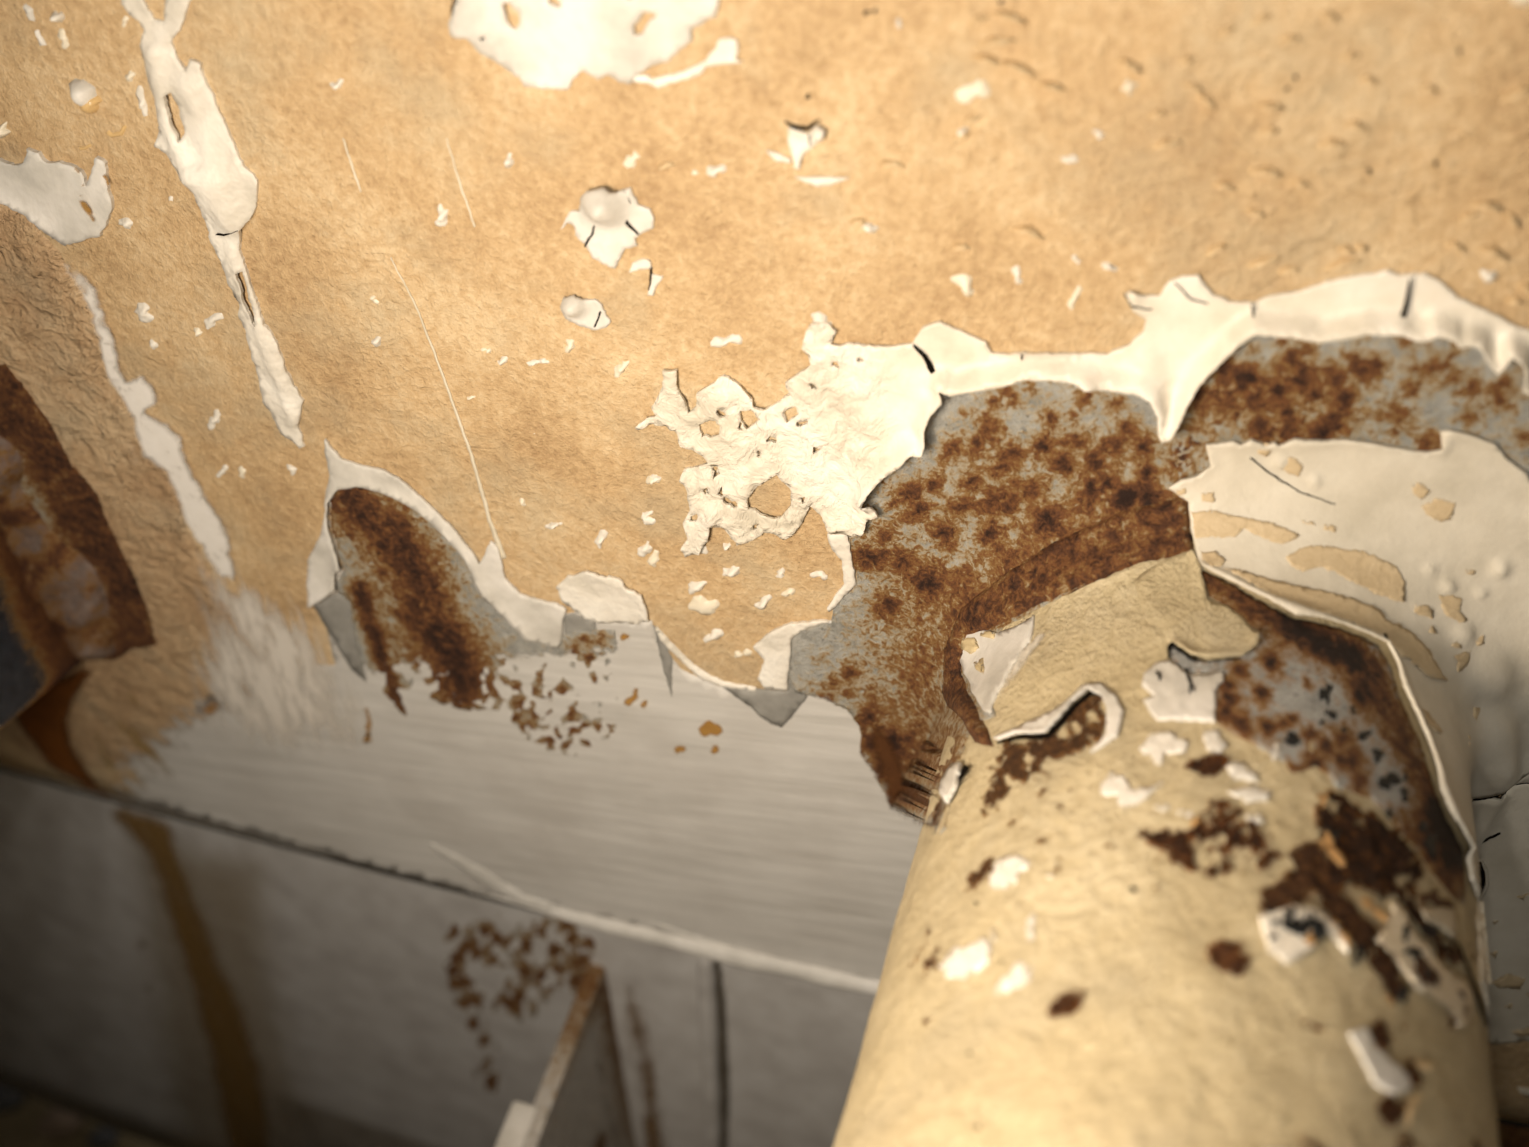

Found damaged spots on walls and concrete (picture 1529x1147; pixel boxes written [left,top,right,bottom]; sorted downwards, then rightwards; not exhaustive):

peeling [448,0,743,90]
peeling [635,269,1529,691]
rust [0,364,157,789]
rust [306,335,1529,834]
peeling [939,762,962,804]
peeling [960,615,1035,714]
peeling [993,682,1124,754]
peeling [1100,429,1529,1045]
rust [964,856,995,894]
rust [444,913,596,1092]
rust [1046,989,1086,1020]
rust [1104,789,1464,1147]